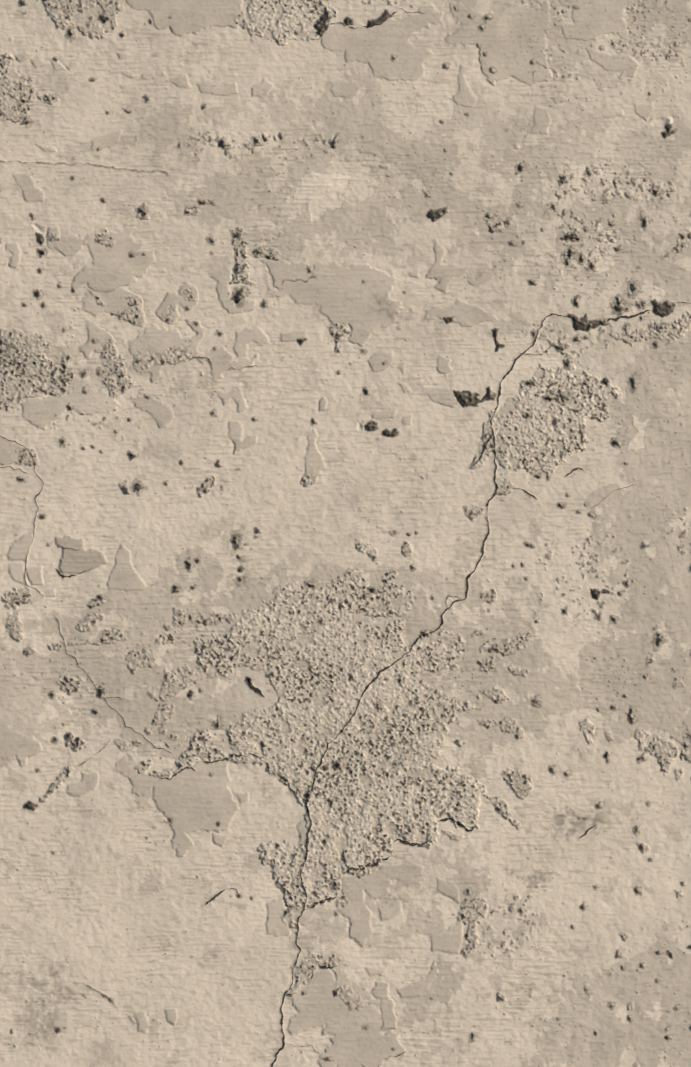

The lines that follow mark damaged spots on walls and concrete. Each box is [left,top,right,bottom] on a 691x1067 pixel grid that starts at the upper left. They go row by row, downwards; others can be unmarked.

spalling [424,190,449,223]
spalling [540,157,691,282]
spalling [0,172,307,470]
spalling [210,227,691,495]
spalling [119,478,147,497]
spalling [197,459,224,498]
crack [0,436,170,753]
crack [247,677,264,697]
spalling [0,527,650,947]
crack [271,310,650,1067]
spalling [642,626,669,680]
crack [204,888,241,906]